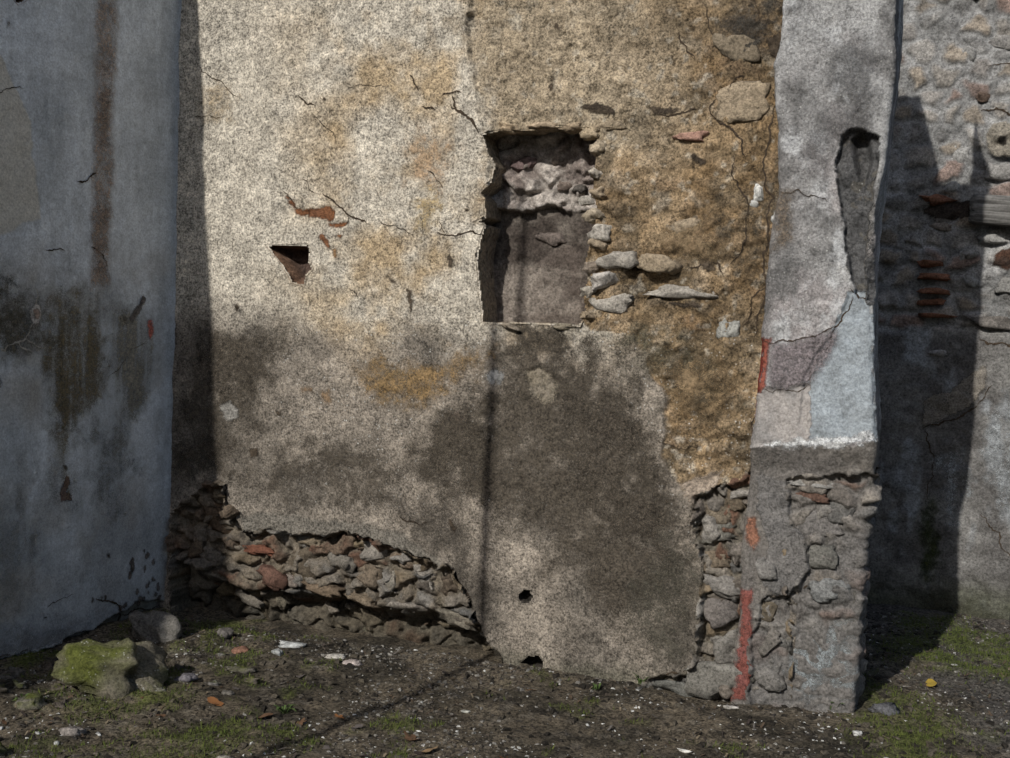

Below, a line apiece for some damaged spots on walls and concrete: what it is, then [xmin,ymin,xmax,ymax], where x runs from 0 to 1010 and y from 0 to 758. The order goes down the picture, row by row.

leakage [0,0,116,458]
leakage [113,310,153,418]
spalling [285,196,347,258]
flaking render [498,120,719,330]
crack [657,75,868,344]
peeling [750,128,881,449]
spalling [115,479,503,663]